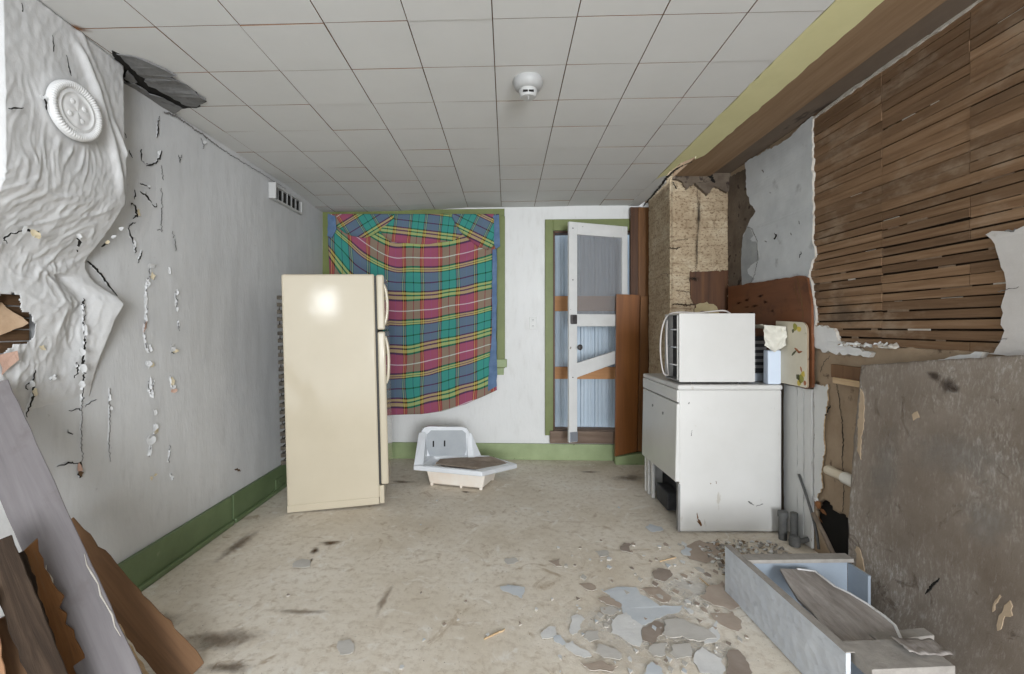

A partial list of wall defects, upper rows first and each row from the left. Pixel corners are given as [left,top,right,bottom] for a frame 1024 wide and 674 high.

flaking render [672,0,1024,360]
spalling [0,294,46,375]
peeling [143,263,171,457]
spalling [813,497,849,555]